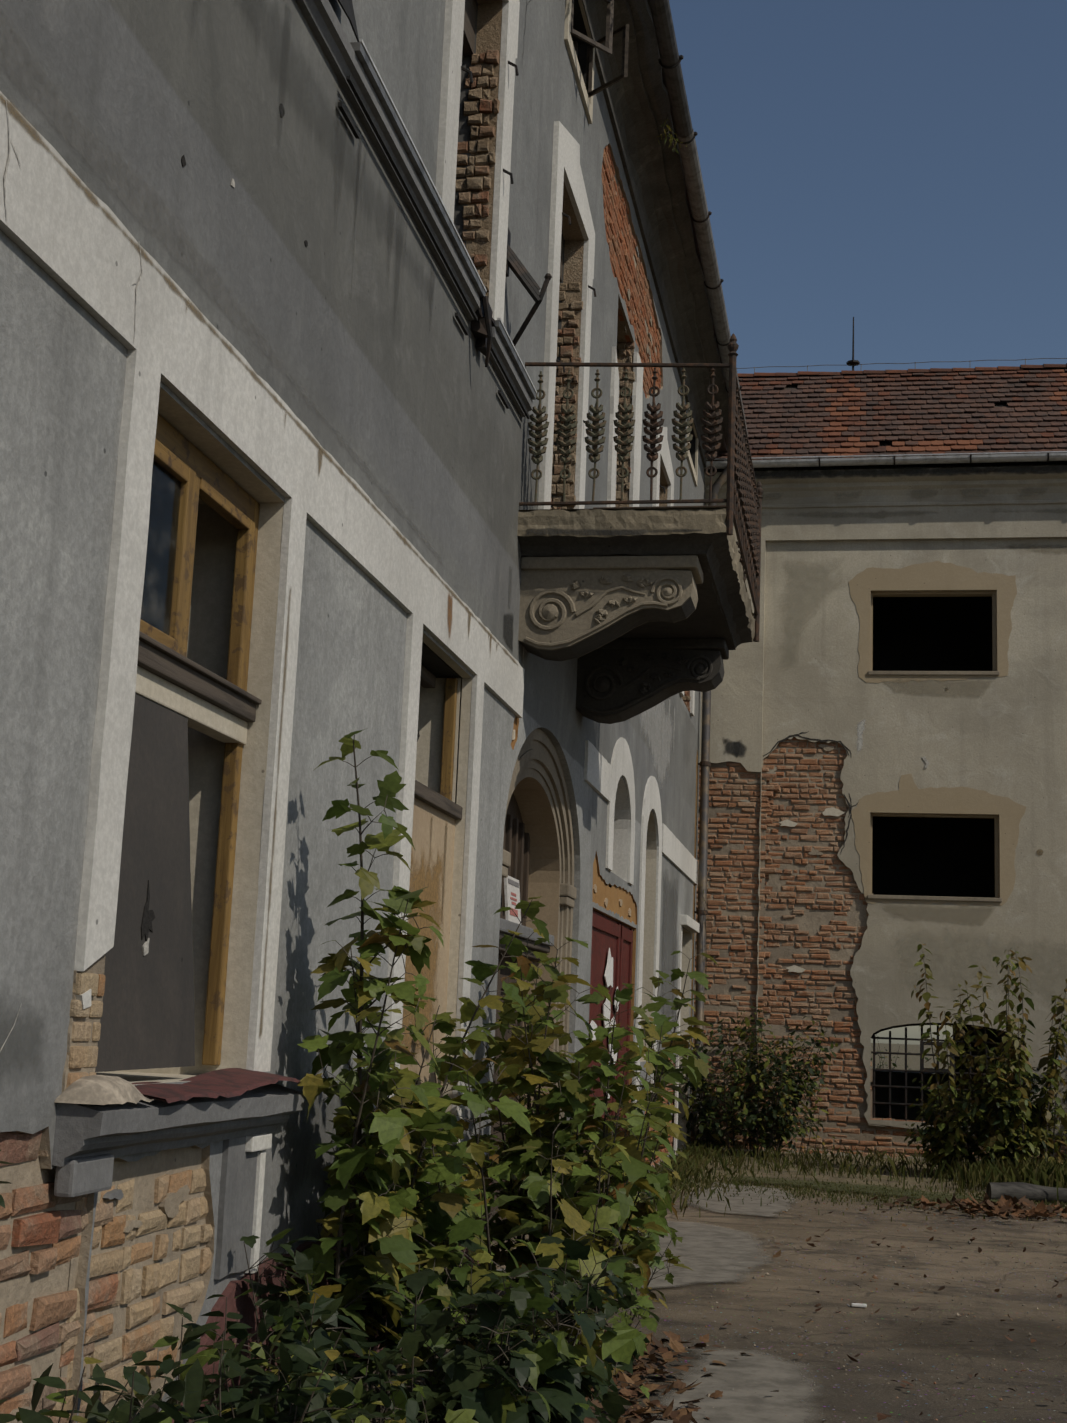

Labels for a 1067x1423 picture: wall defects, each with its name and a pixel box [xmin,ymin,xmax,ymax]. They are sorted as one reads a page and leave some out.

flaking render [601,145,661,398]
flaking render [62,953,106,1092]
flaking render [644,1080,674,1166]
flaking render [691,737,935,1158]
flaking render [50,1147,213,1423]